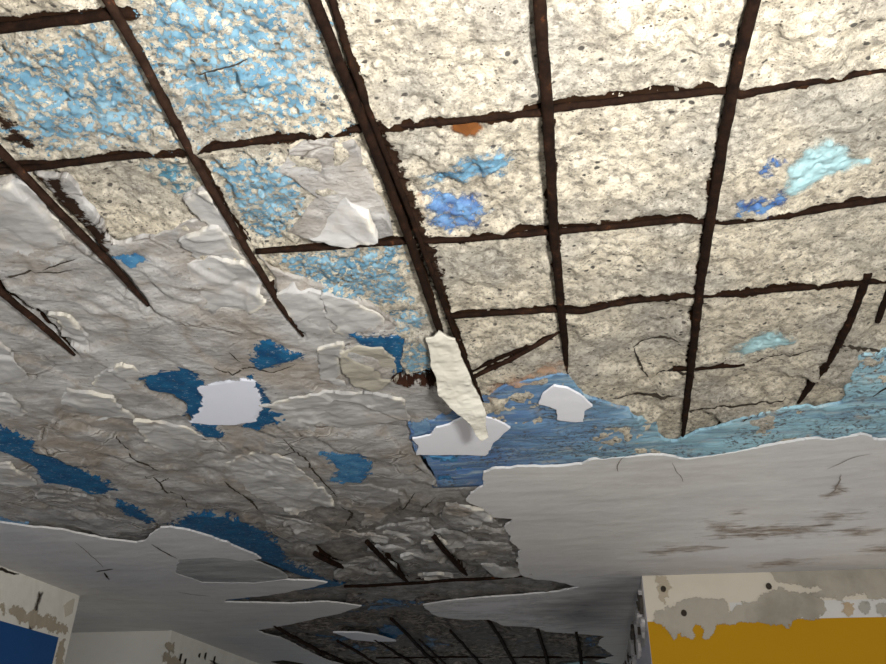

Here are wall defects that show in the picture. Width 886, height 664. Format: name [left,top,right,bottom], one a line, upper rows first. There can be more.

rust [0,104,35,153]
rust [38,171,117,256]
rust [376,120,449,296]
peeling [139,367,206,419]
rust [390,367,436,389]
spalling [474,298,694,439]
crack [613,335,786,426]
crack [116,436,188,508]
crack [224,481,258,510]
crack [282,440,353,526]
spalling [259,592,613,664]
peeling [623,569,886,664]